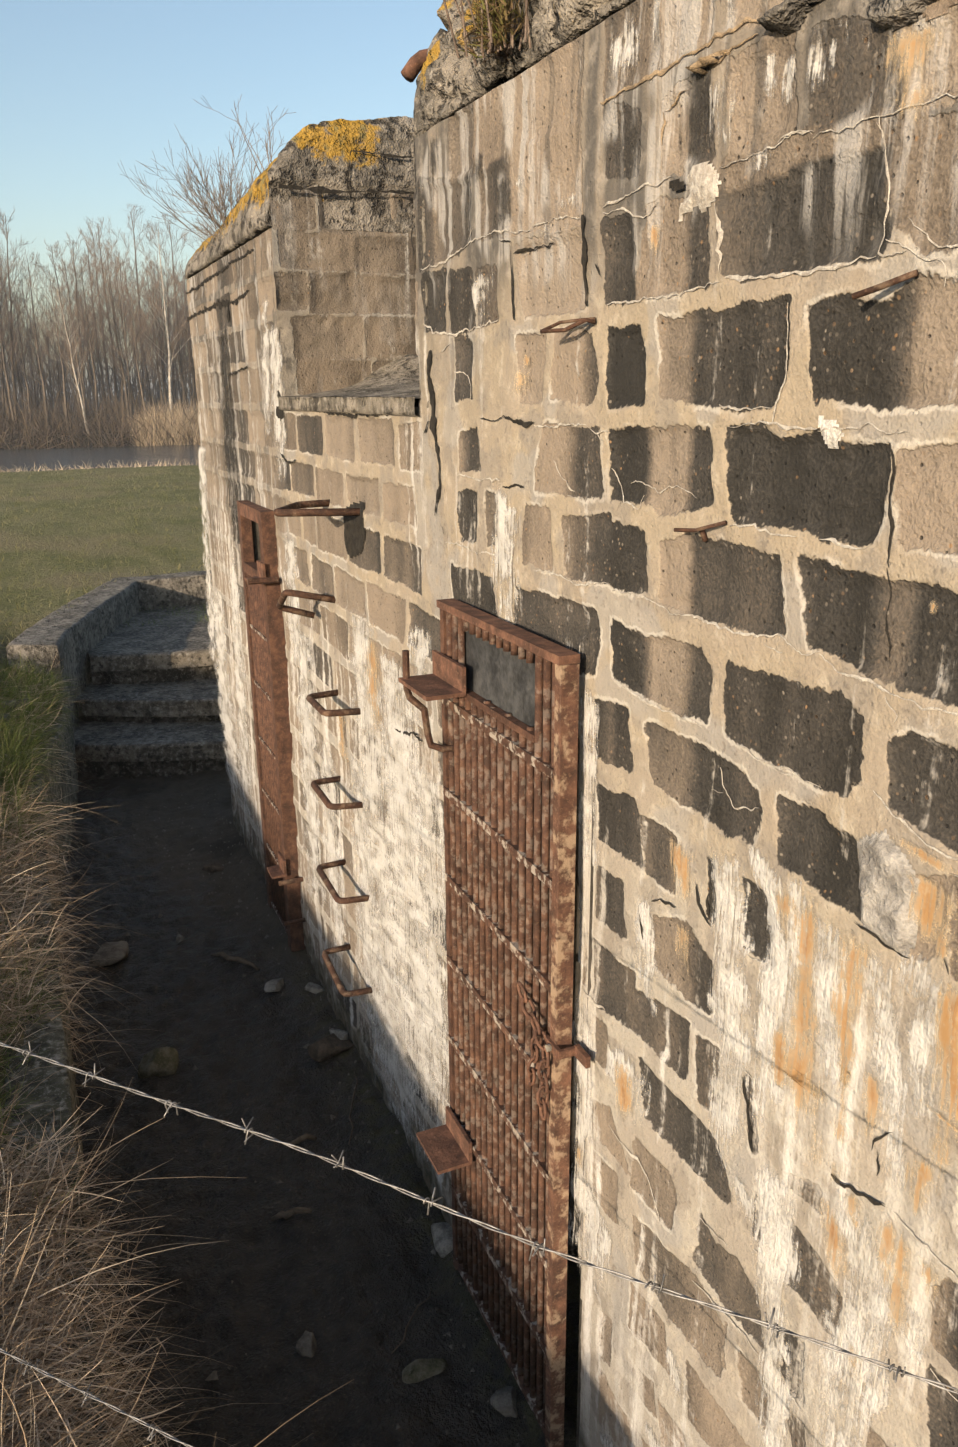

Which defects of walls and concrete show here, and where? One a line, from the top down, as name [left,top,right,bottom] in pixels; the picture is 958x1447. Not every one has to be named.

leakage [610,5,658,73]
leakage [766,42,836,103]
leakage [679,85,735,153]
crack [277,17,958,728]
corrosion [771,894,867,1139]
corrosion [616,1065,632,1112]
crack [718,1051,753,1153]
corrosion [866,1075,879,1130]
corrosion [906,984,958,1212]
corrosion [825,1195,857,1274]
corrosion [879,1224,935,1326]